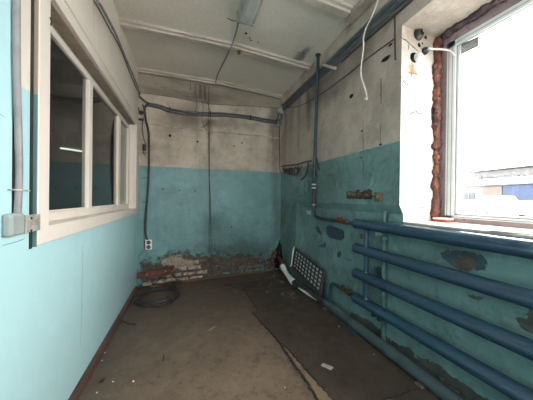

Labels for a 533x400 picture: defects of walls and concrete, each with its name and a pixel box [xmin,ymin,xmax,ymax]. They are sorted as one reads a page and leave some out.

peeling [315,224,345,248]
spalling [139,240,283,287]
peeling [439,249,489,273]
peeling [516,309,533,334]
spalling [349,312,489,400]